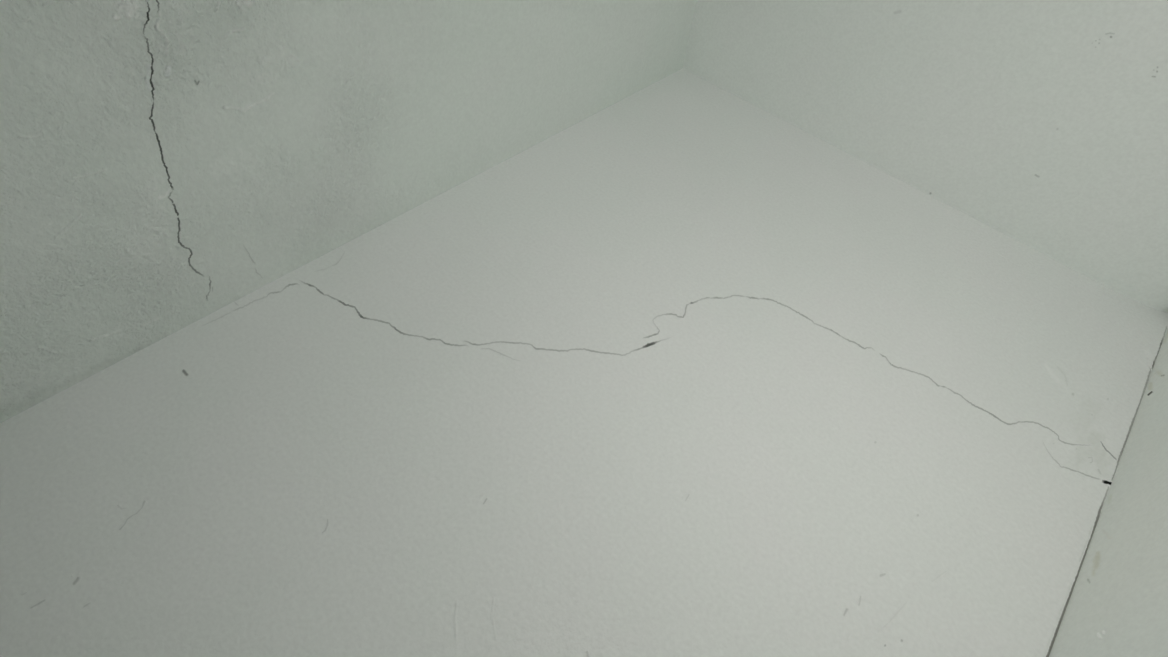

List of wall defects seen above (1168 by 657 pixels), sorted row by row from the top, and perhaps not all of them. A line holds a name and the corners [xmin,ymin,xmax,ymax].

crack [141,0,215,302]
crack [231,278,1168,657]